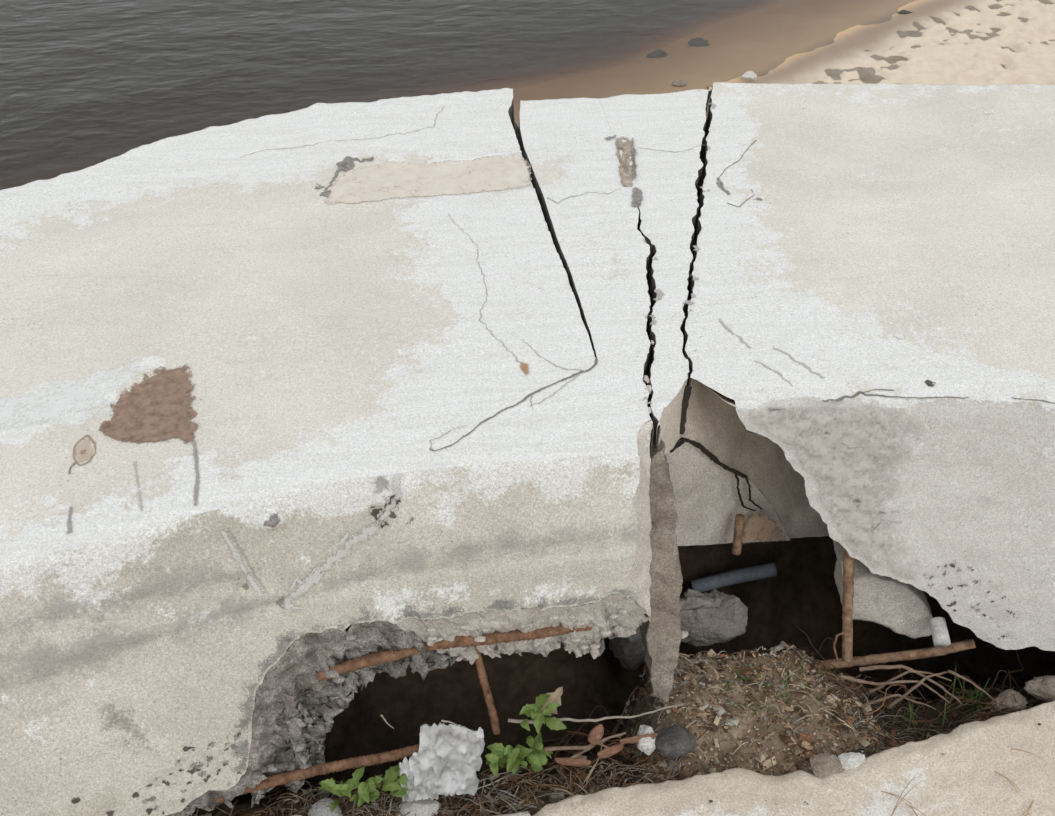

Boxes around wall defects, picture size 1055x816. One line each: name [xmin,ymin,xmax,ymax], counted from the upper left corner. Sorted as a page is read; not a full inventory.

peeling [316,147,531,204]
spalling [604,135,643,206]
crack [429,100,617,451]
crack [637,85,763,511]
rust [99,365,200,506]
crack [821,389,969,402]
rust [742,514,787,544]
rust [814,548,976,670]
spalling [166,587,650,816]
rust [316,623,592,735]
rust [241,744,420,795]